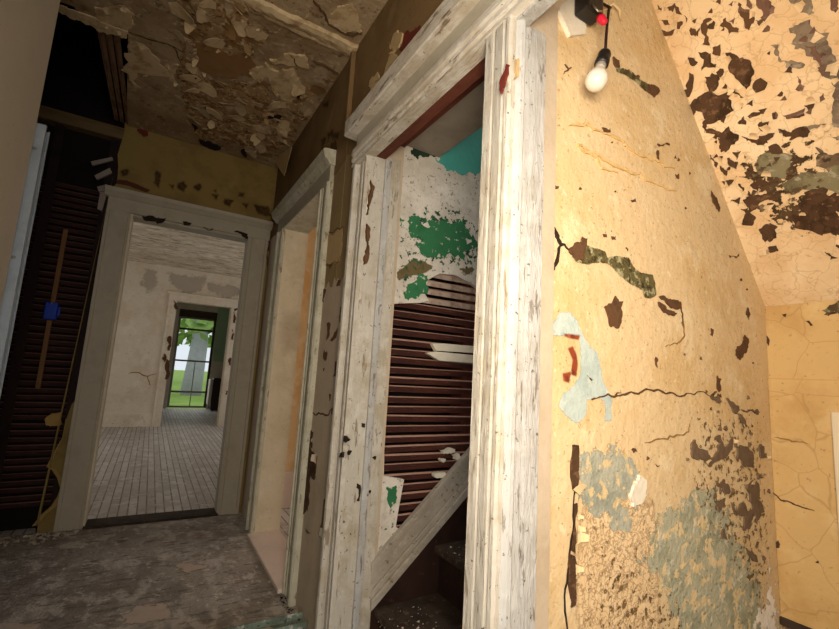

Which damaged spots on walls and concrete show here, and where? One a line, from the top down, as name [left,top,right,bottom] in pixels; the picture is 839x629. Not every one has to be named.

peeling [62,0,327,158]
peeling [328,3,362,33]
peeling [369,25,421,90]
peeling [658,0,839,260]
peeling [323,307,341,377]
spalling [372,201,479,528]
peeling [735,335,749,360]
spalling [303,431,317,514]
peeling [567,442,647,608]
crack [591,388,814,614]
peeling [637,375,771,629]